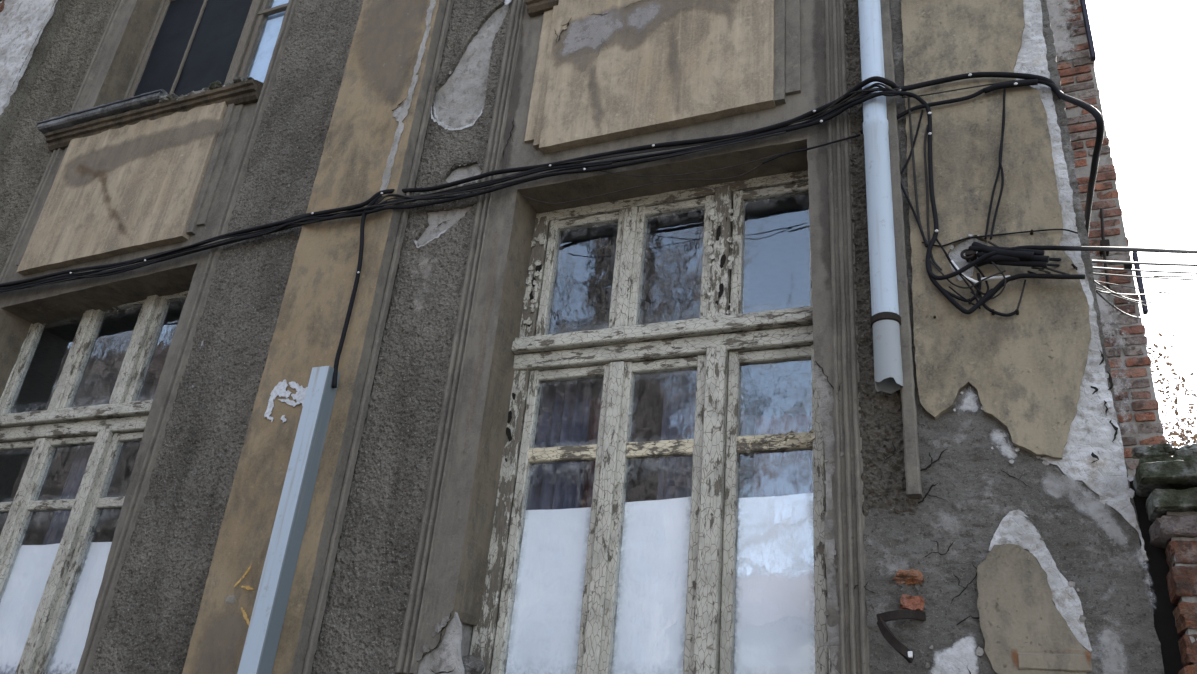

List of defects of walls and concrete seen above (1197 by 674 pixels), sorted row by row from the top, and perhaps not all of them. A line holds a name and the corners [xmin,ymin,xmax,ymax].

flaking render [0,0,58,115]
spalling [380,0,436,191]
flaking render [430,0,511,132]
peeling [562,0,659,55]
peeling [523,234,545,333]
flaking render [1014,0,1152,597]
flaking render [954,390,983,412]
flaking render [990,430,1020,464]
flaking render [890,565,928,611]
flaking render [988,510,1125,674]
flaking render [406,612,465,674]
flaking render [925,636,984,674]